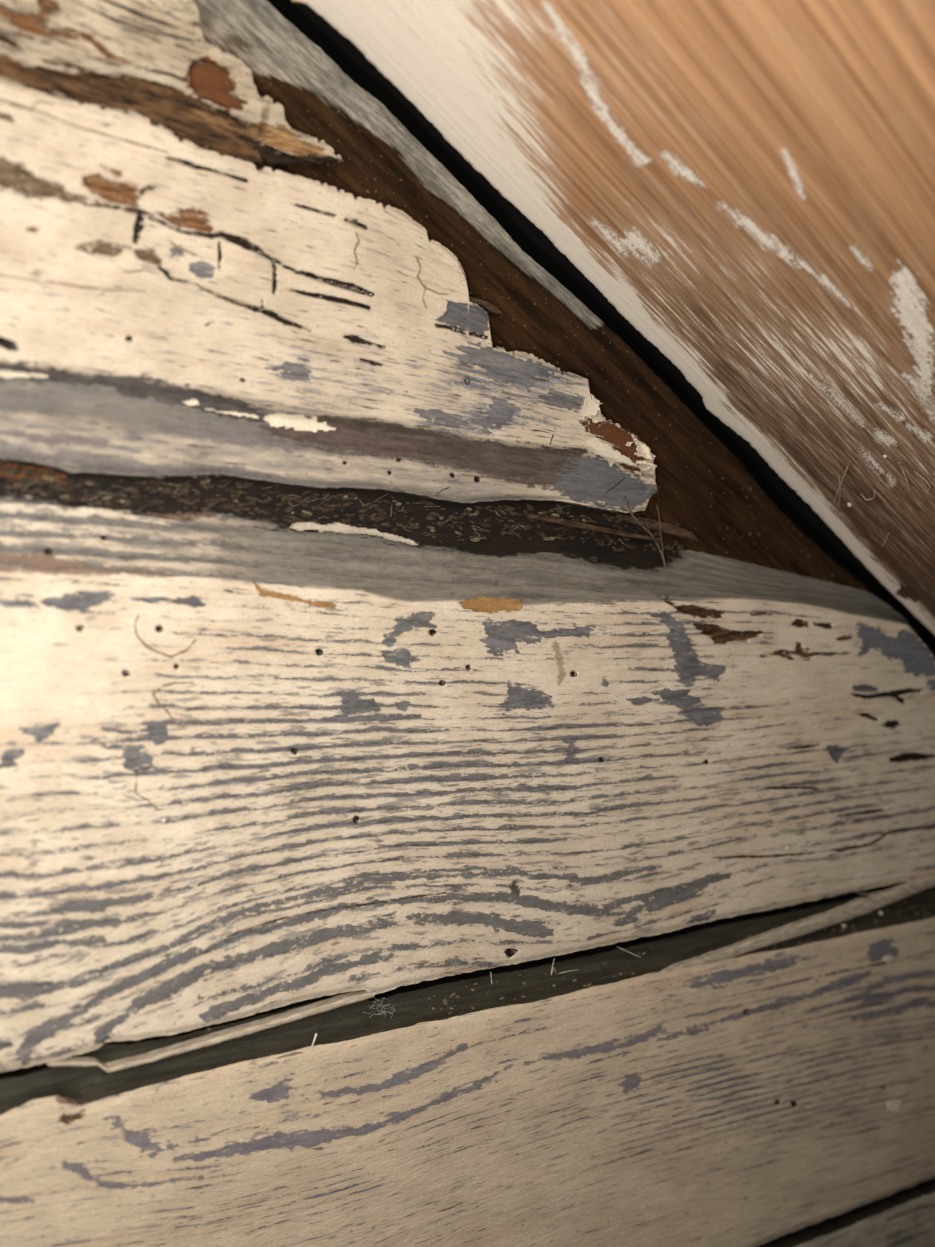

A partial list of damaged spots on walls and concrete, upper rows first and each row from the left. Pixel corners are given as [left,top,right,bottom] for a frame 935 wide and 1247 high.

peeling [76,240,215,279]
peeling [265,358,312,381]
peeling [413,300,602,434]
peeling [552,435,659,511]
peeling [289,522,418,545]
peeling [381,611,437,668]
peeling [458,596,596,656]
peeling [626,610,726,726]
peeling [856,622,935,691]
peeling [322,690,421,724]
peeling [499,681,555,715]
peeling [826,745,849,764]